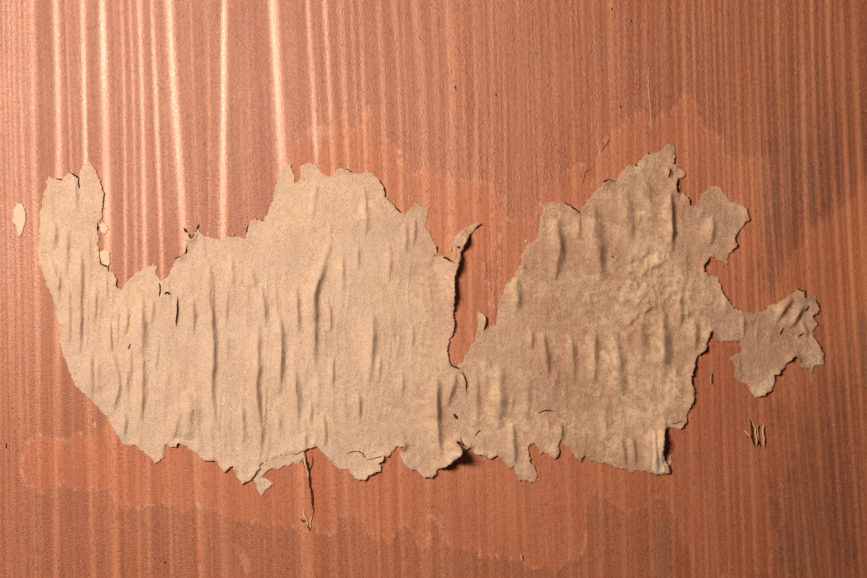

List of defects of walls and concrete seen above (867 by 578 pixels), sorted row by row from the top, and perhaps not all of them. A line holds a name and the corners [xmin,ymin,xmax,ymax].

peeling [12,203,26,236]
peeling [99,249,110,266]